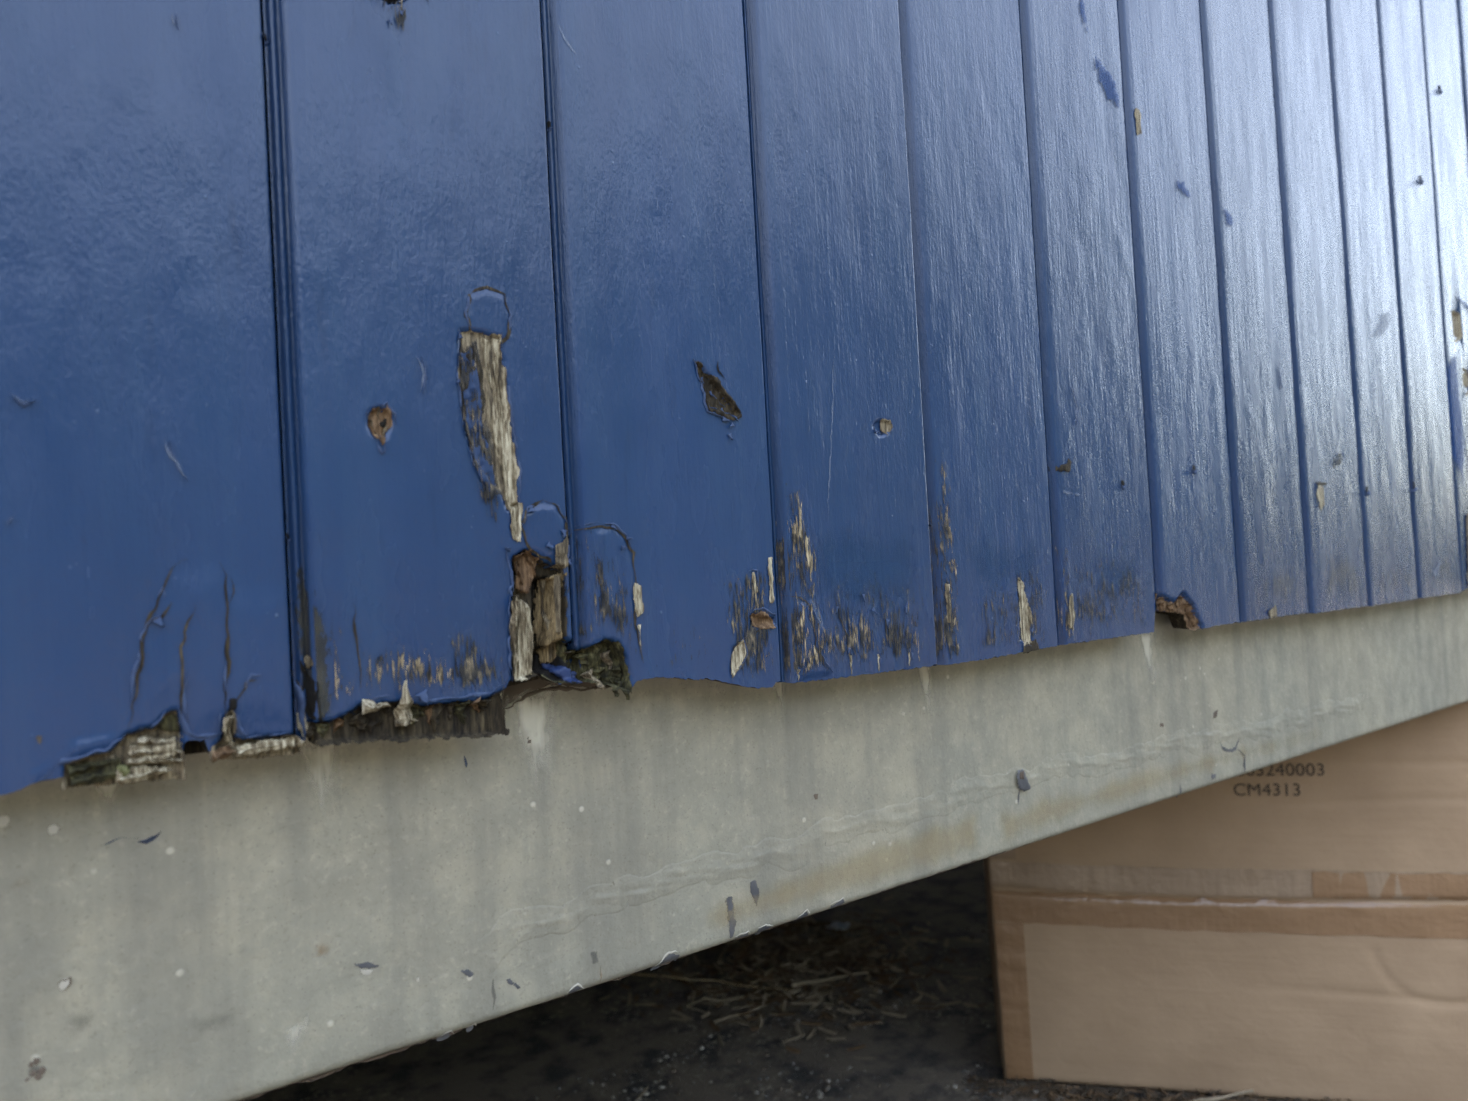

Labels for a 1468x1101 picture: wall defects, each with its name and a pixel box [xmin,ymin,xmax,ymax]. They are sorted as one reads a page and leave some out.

peeling [456,286,572,682]
spalling [693,359,742,440]
peeling [671,459,1203,681]
peeling [1445,296,1468,487]
peeling [292,671,306,740]